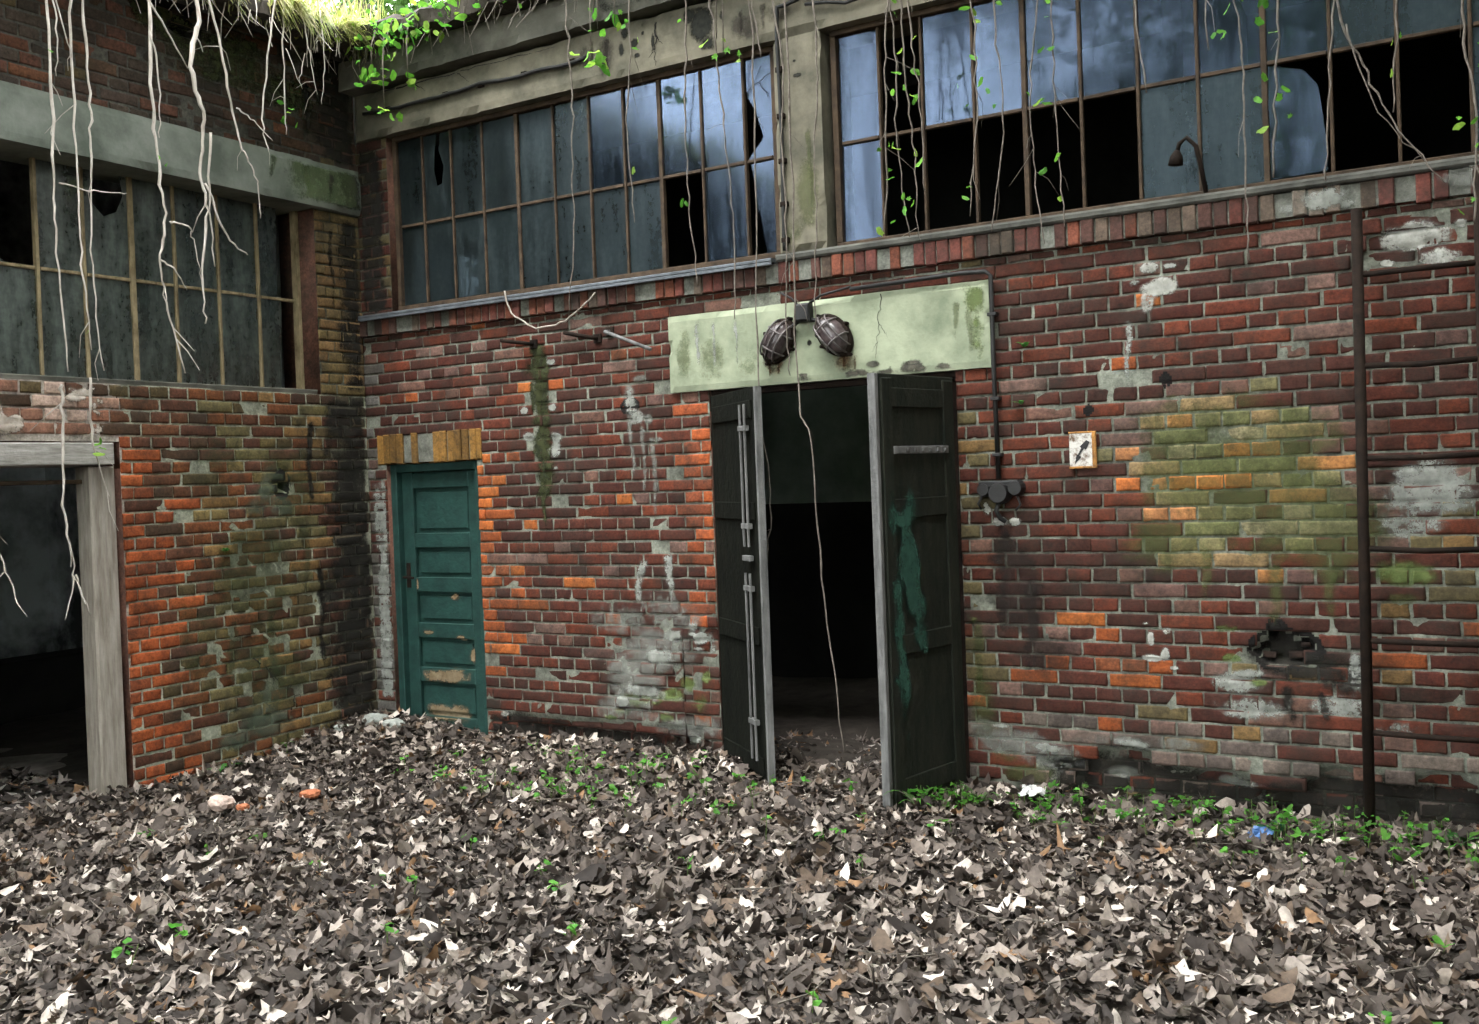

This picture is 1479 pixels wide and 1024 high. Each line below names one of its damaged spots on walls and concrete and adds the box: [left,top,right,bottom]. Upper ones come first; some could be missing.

spalling [1379,218,1467,267]
flaking render [1131,262,1177,311]
flaking render [1124,324,1133,379]
damp [625,376,662,500]
damp [593,555,722,742]
damp [1212,632,1362,720]
peeling [428,704,471,720]
damp [972,719,1084,771]
damp [1096,736,1197,751]